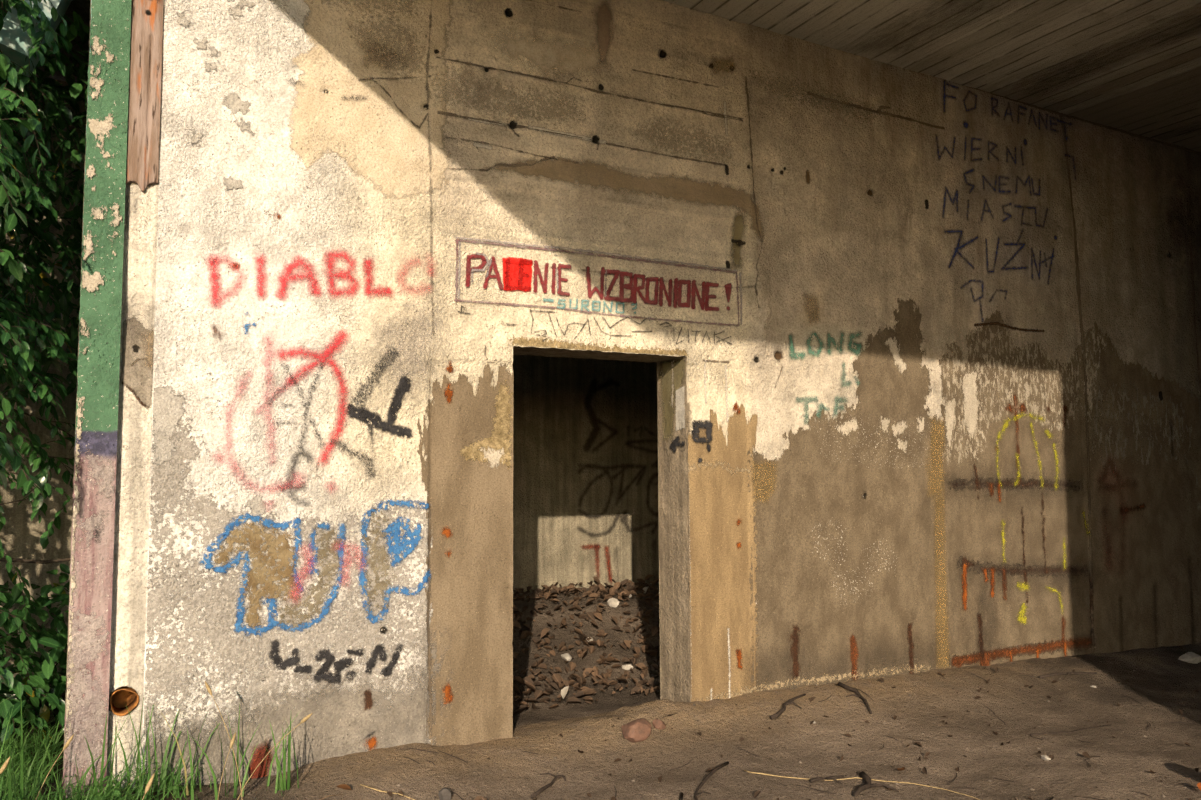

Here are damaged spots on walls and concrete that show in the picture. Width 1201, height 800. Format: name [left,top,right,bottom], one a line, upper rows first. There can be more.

peeling [89,35,117,99]
peeling [289,0,452,199]
peeling [87,114,117,191]
peeling [82,202,122,293]
peeling [80,318,91,355]
peeling [688,296,1201,702]
corrosion [952,395,1093,668]
corrosion [790,626,800,679]
corrosion [850,635,858,679]